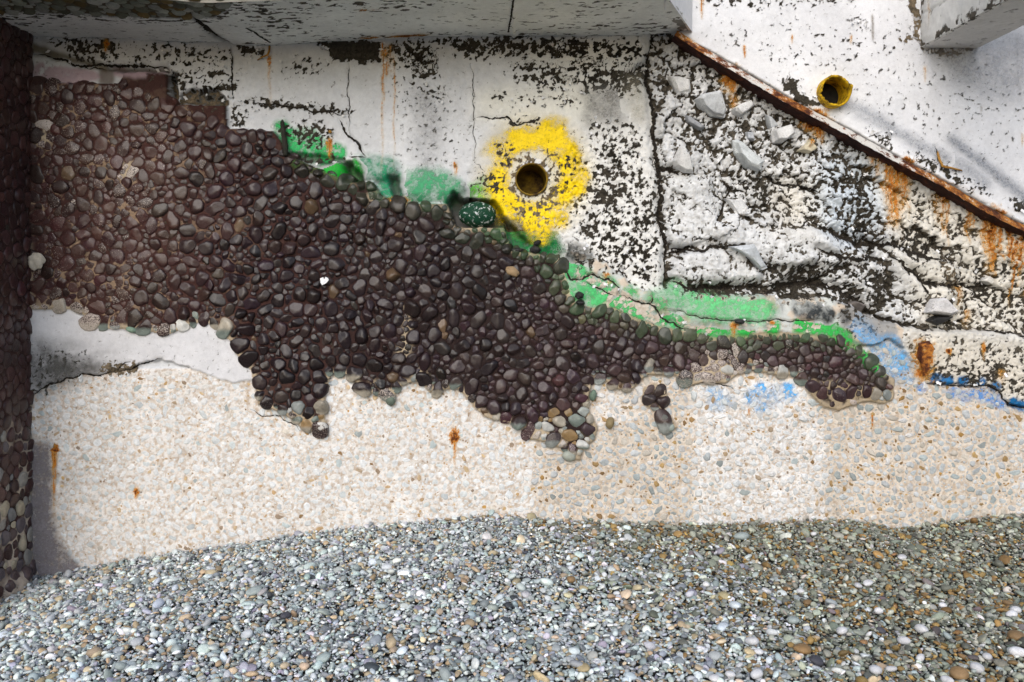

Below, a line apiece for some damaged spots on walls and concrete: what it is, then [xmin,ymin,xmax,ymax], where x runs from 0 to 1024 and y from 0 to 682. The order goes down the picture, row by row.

crack [195,18,365,158]
peeling [279,35,722,183]
crack [470,66,534,170]
spalling [696,0,1024,195]
crack [566,47,981,331]
corrosion [867,156,915,224]
spalling [1009,197,1024,213]
corrosion [964,208,1024,297]
crack [35,358,158,394]
crack [984,329,1024,338]
corrosion [51,445,59,505]
corrosion [449,426,459,455]